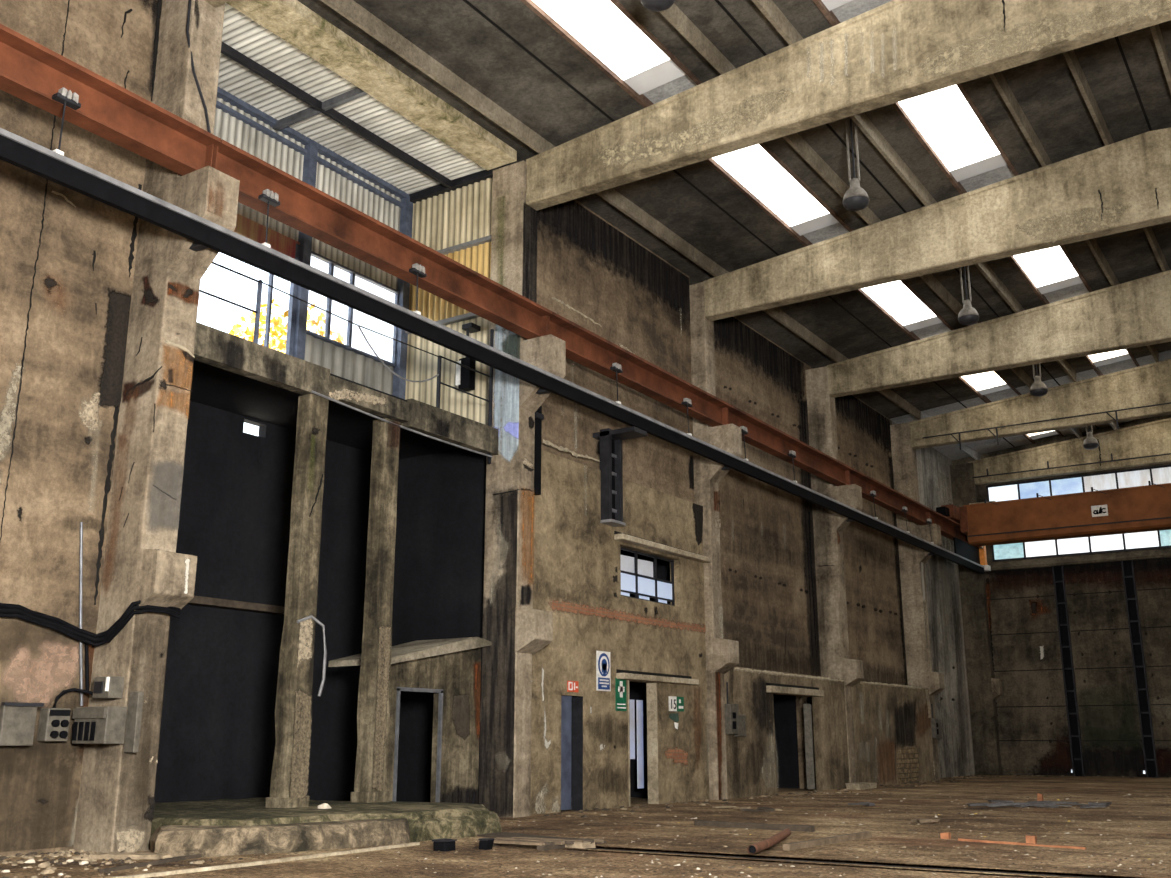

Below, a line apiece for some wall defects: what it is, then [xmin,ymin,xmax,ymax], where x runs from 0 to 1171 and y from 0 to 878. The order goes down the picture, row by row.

crack [61,0,70,56]
crack [0,179,48,540]
flaking render [0,365,24,460]